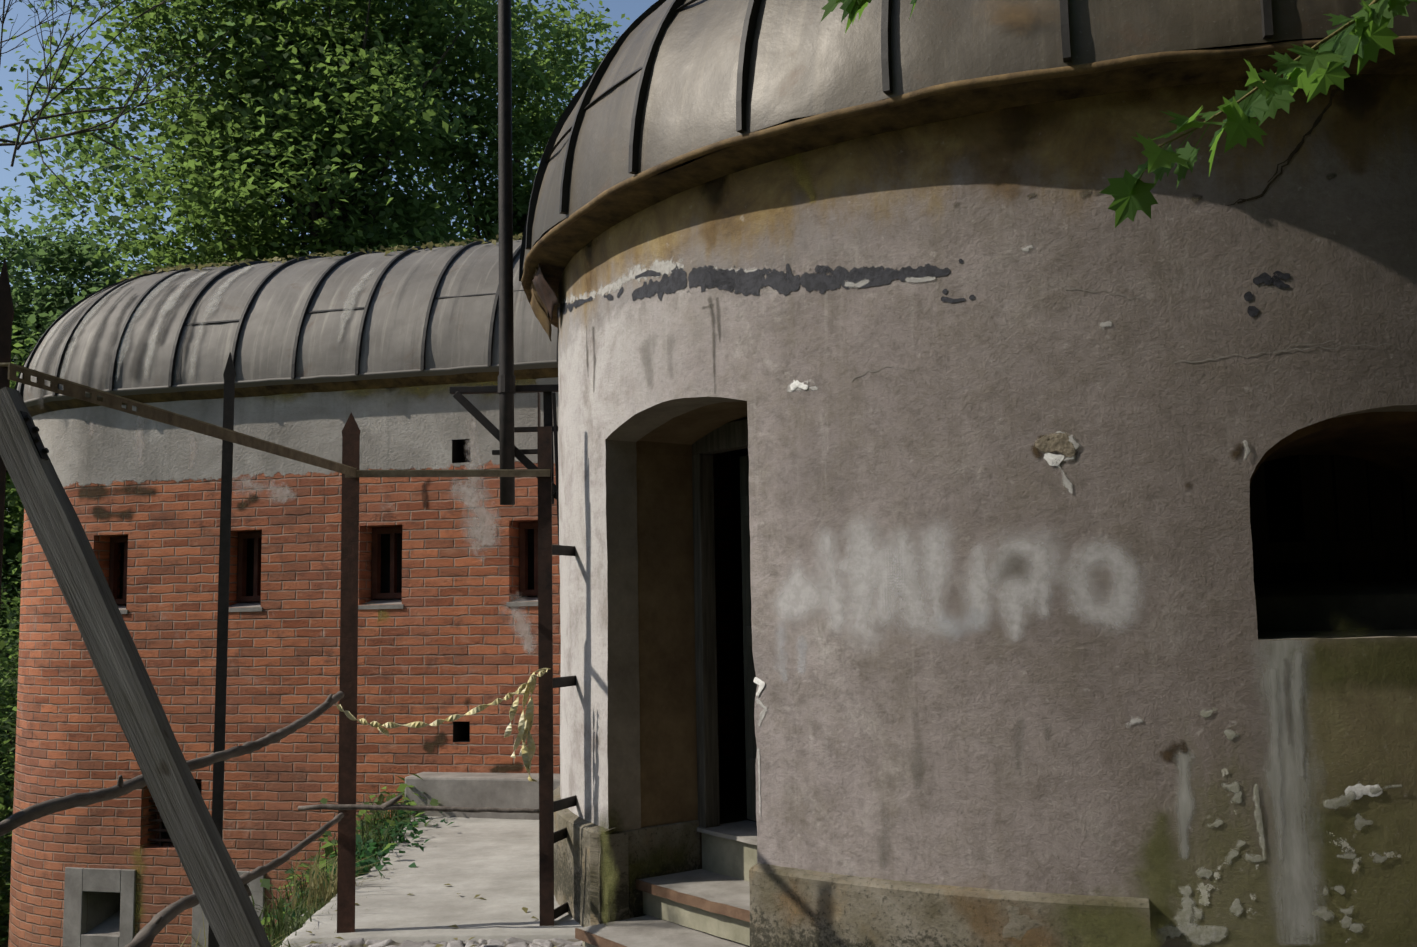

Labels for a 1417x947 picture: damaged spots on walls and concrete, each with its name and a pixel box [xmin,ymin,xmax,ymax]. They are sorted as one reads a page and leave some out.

peeling [557,259,975,318]
damp [453,422,493,548]
flaking render [1032,431,1079,494]
flaking render [1161,741,1187,763]
damp [1263,640,1317,944]
flaking render [1154,768,1266,945]
flaking render [1311,783,1402,942]